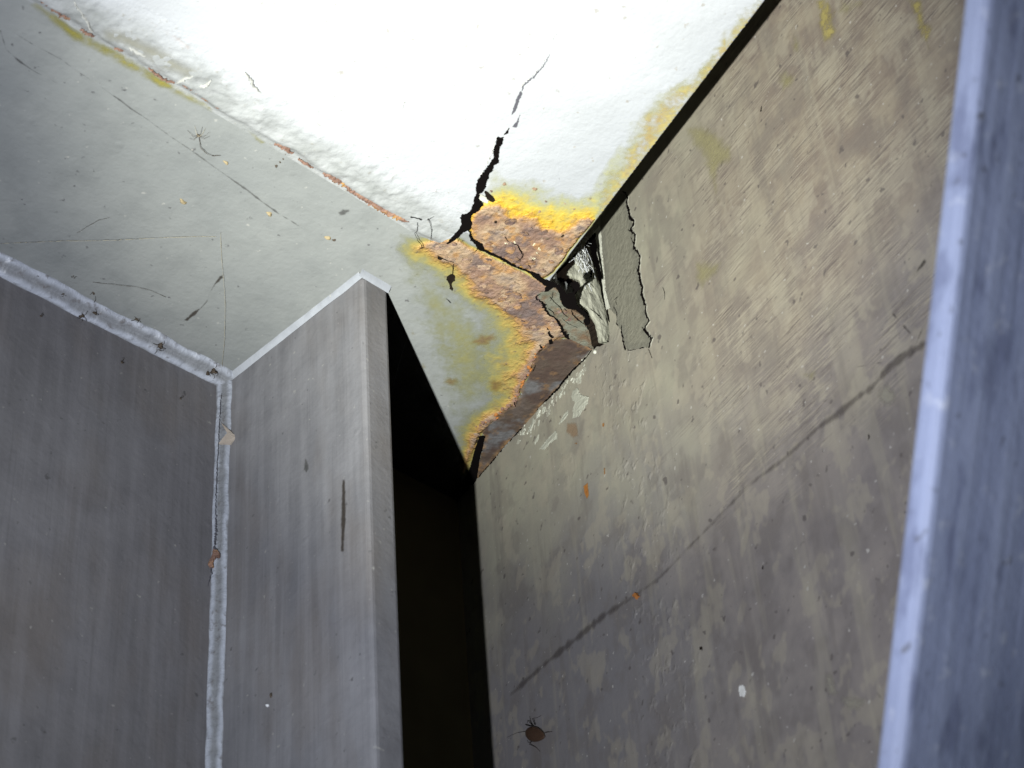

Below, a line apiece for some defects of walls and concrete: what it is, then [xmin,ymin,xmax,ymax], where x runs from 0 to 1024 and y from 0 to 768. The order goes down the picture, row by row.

rust [720,19,748,54]
peeling [475,258,596,478]
crack [410,52,665,486]
rust [402,66,711,477]
peeling [593,194,650,350]